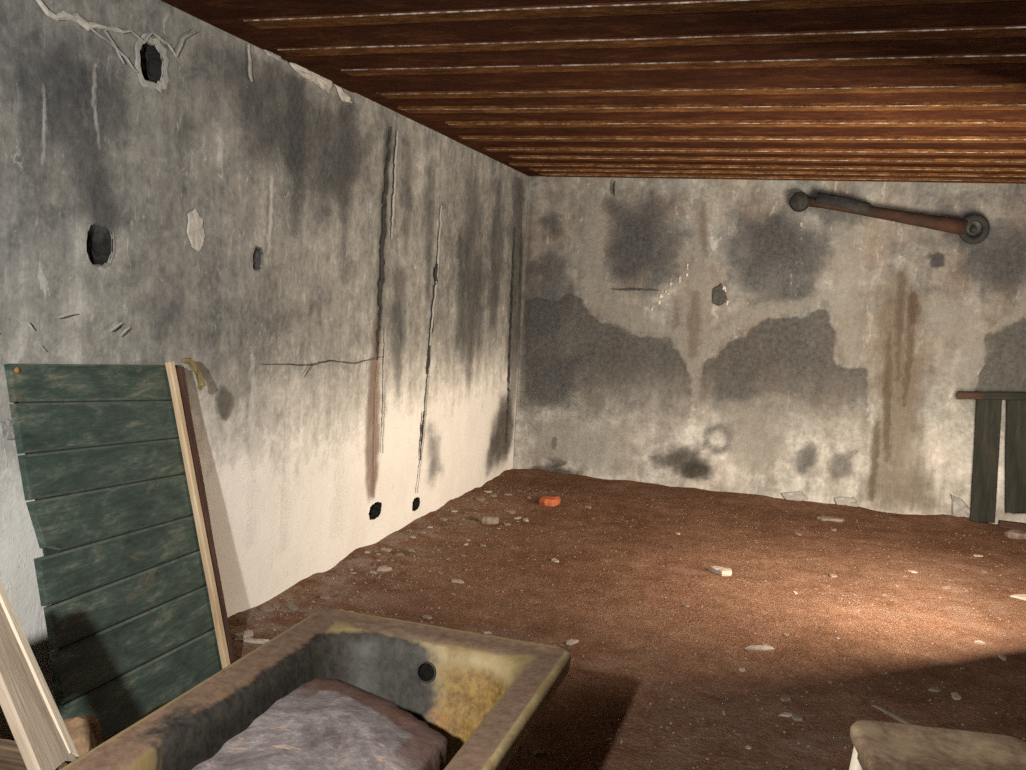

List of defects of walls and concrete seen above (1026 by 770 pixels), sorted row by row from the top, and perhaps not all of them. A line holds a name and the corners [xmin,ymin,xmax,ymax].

crack [36,0,198,73]
spalling [187,208,205,251]
leakage [488,401,513,466]